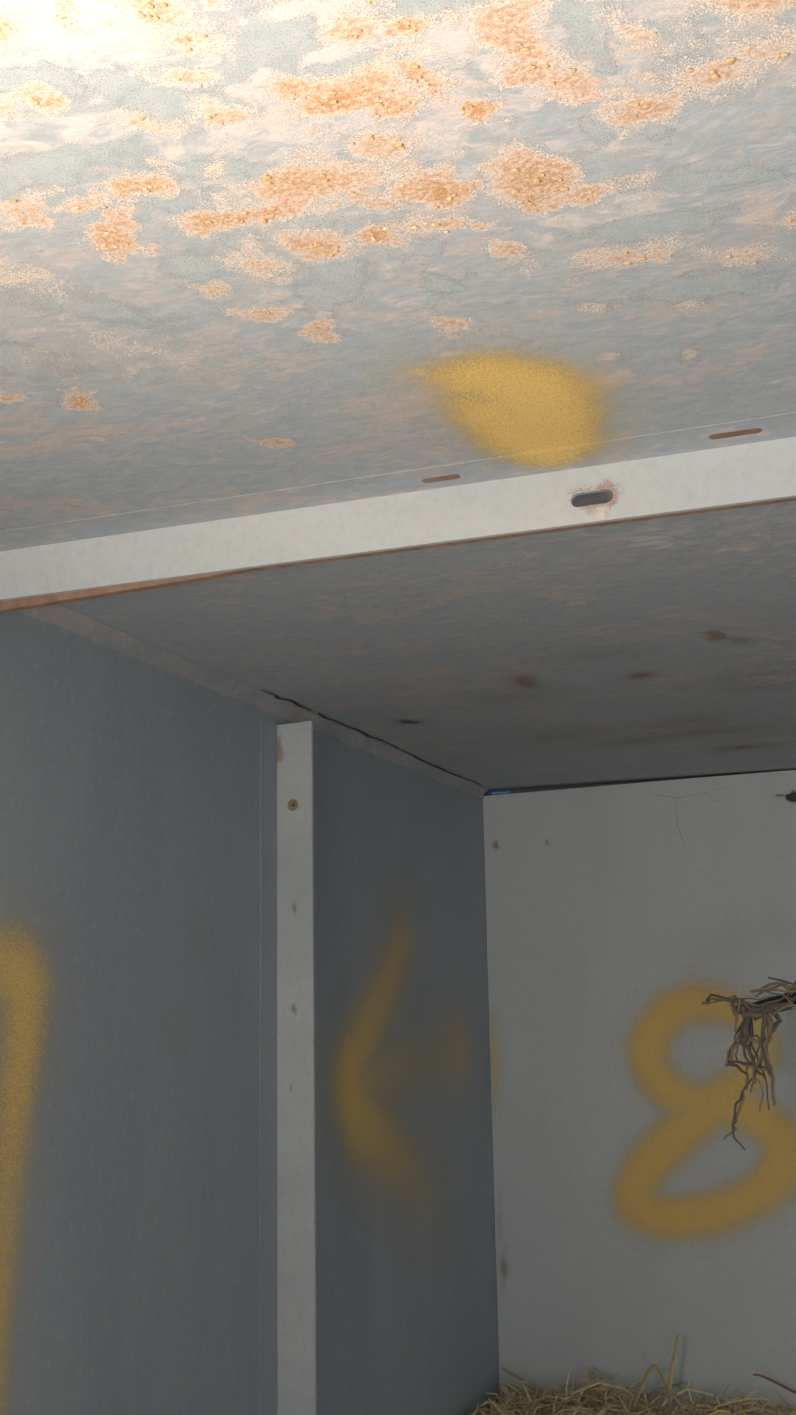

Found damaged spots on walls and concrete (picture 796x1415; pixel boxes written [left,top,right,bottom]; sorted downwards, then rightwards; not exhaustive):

corrosion [0,0,796,345]
corrosion [0,385,108,416]